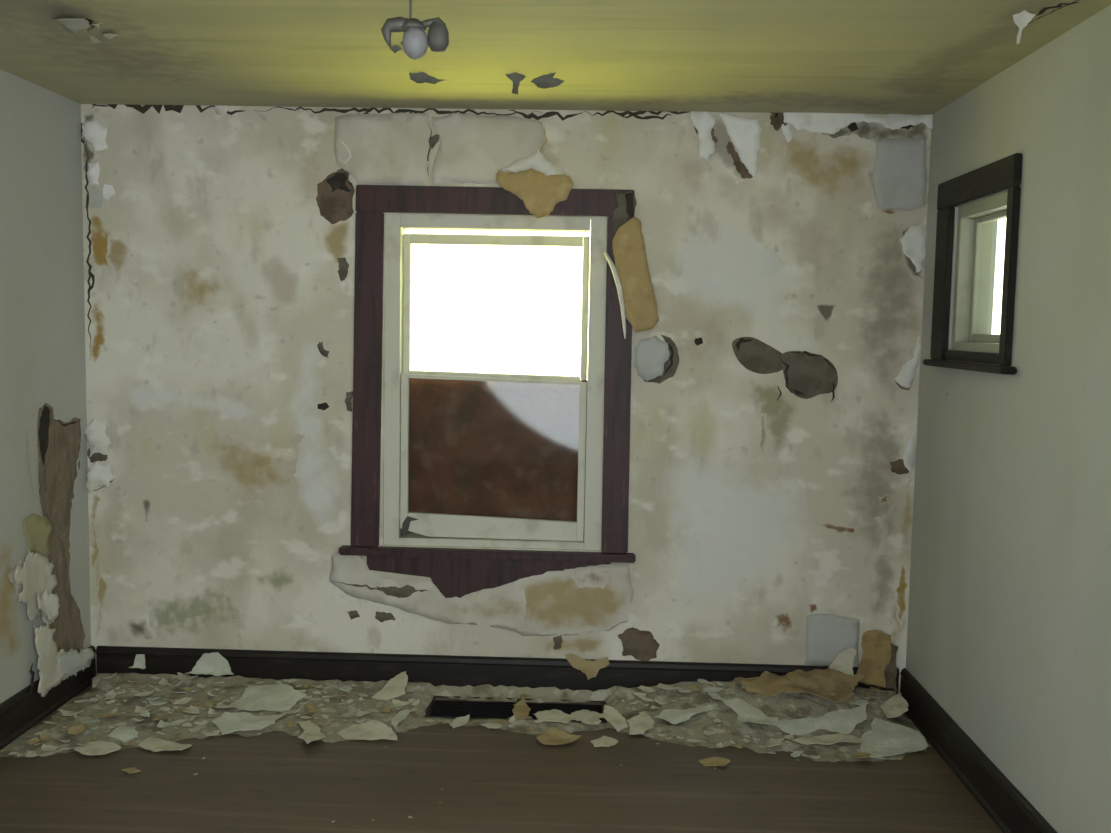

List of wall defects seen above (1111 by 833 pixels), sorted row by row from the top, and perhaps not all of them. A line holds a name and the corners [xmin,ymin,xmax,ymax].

crack [1028,0,1079,24]
flaking render [770,113,931,146]
water stain [81,111,133,277]
flaking render [316,168,355,293]
crack [81,104,688,360]
water stain [88,301,108,365]
flaking render [732,337,838,402]
water stain [196,419,305,514]
flaking render [26,403,108,677]
water stain [122,562,298,648]
water stain [440,567,632,657]
flaking render [618,627,660,661]